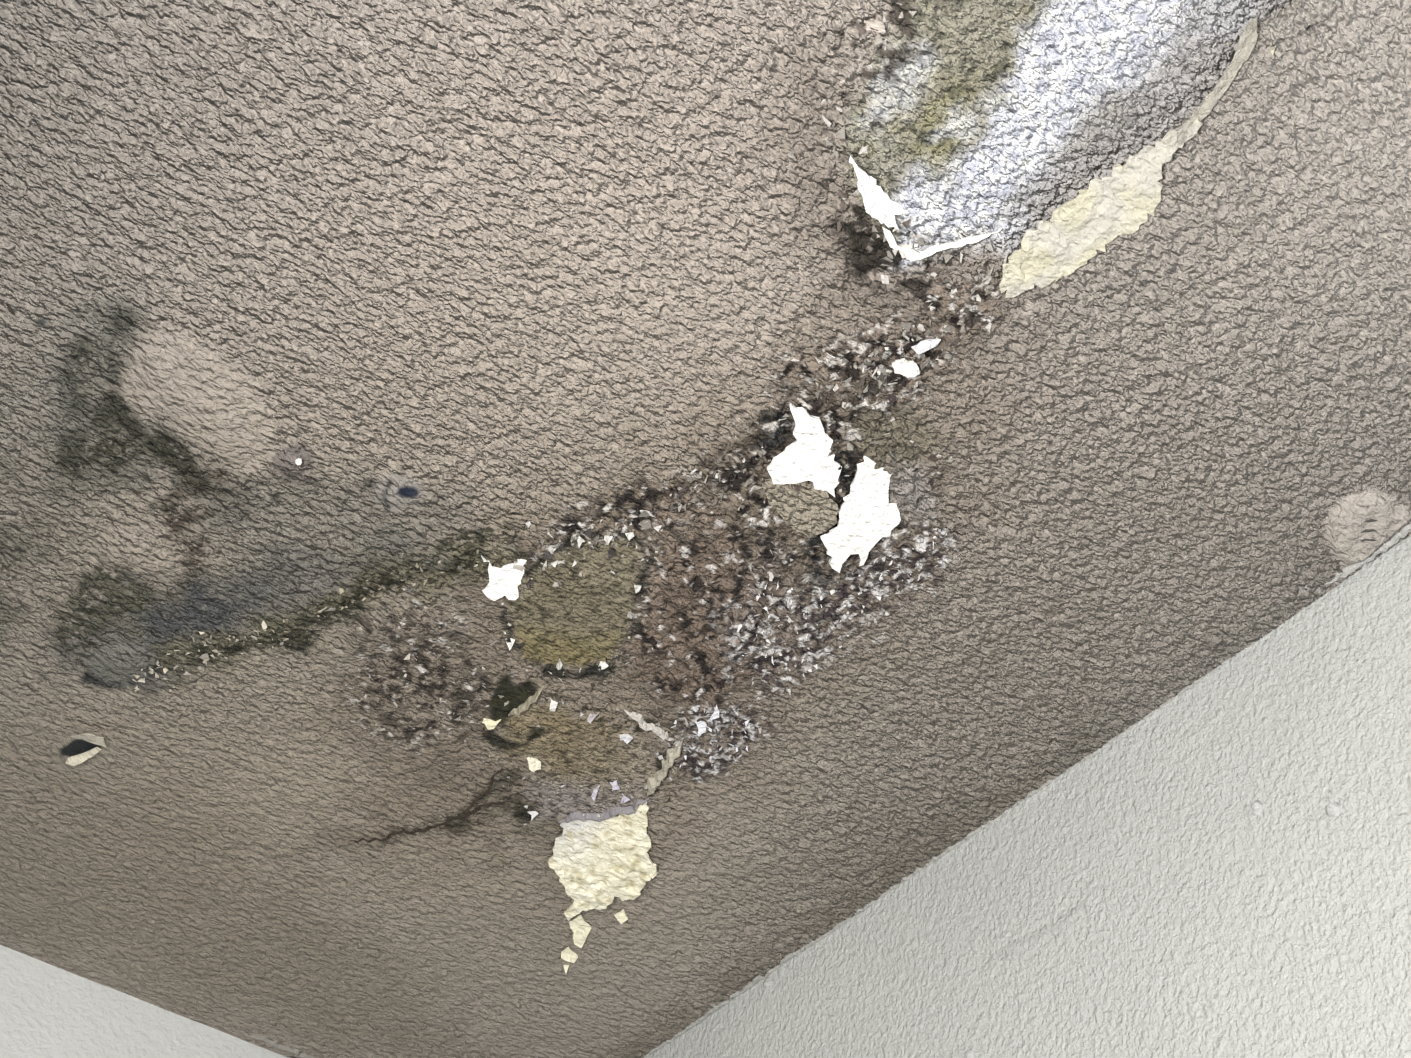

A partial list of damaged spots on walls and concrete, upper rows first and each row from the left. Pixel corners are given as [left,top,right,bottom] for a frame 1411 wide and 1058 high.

damp [0,20,899,1058]
peeling [328,0,1342,846]
damp [638,0,1356,905]
crack [351,767,555,857]
peeling [561,914,592,973]
peeling [614,909,628,924]
damp [553,553,1359,1058]